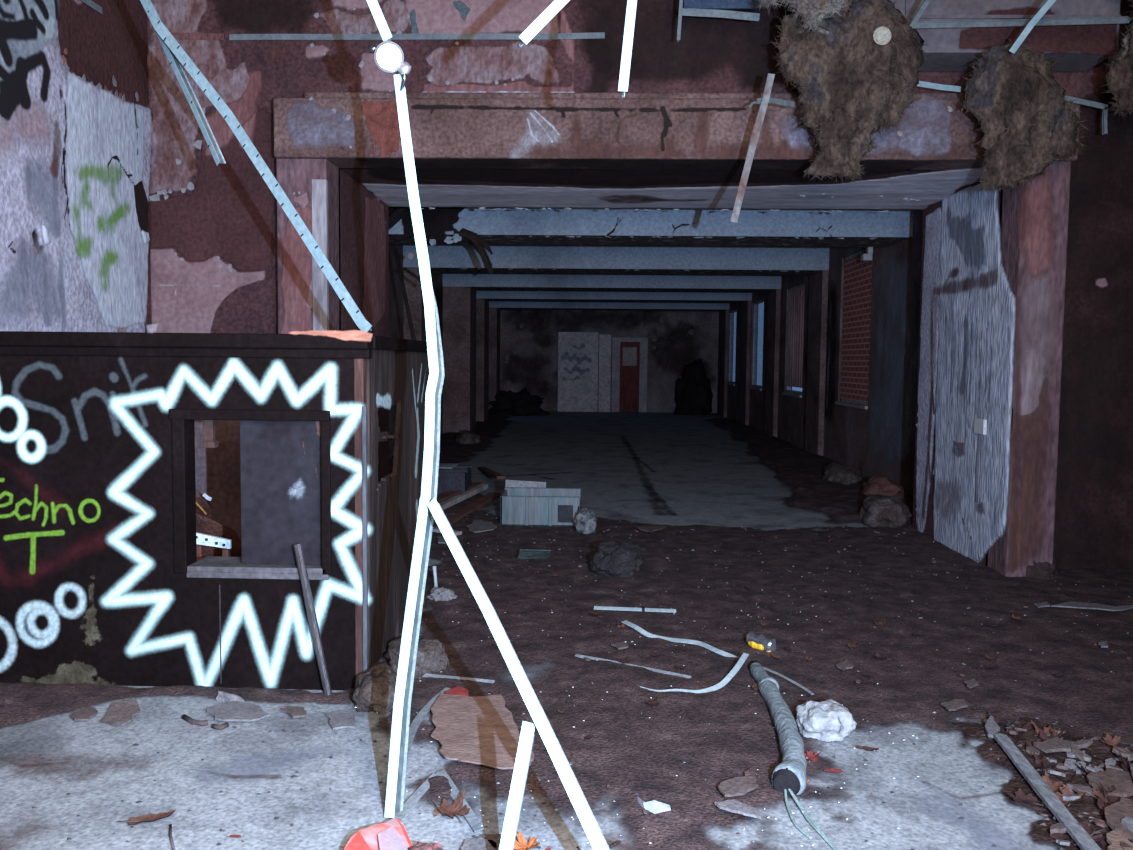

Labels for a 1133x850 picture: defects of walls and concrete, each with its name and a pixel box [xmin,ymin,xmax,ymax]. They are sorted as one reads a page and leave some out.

peeling [0,0,1053,563]